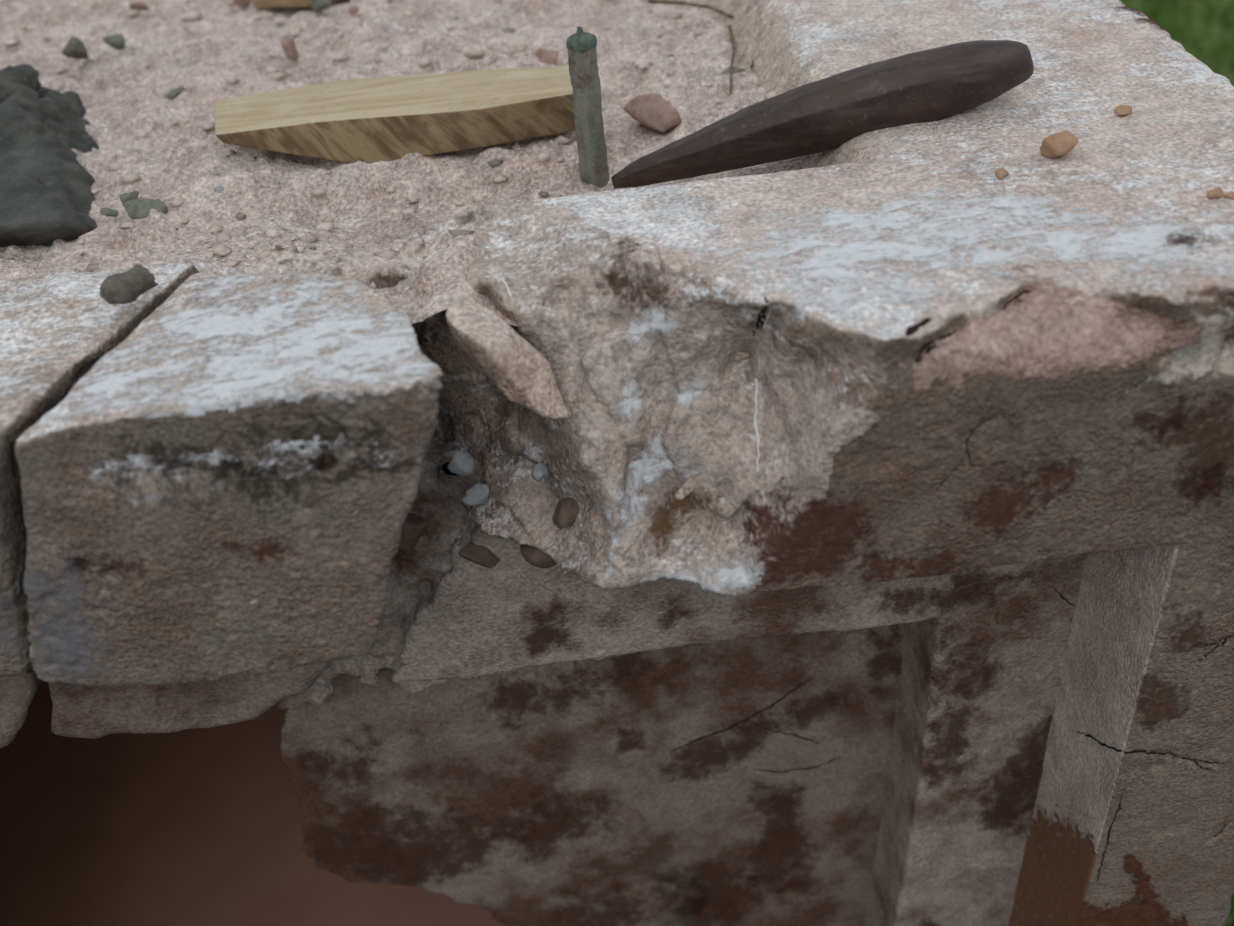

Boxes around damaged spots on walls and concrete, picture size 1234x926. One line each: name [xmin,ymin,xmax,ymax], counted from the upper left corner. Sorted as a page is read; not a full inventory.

spalling [446,200,887,596]
corrosion [743,482,954,584]
corrosion [964,452,1079,540]
corrosion [1133,392,1234,504]
damp [527,604,569,656]
damp [662,692,847,780]
crack [670,677,842,773]
damp [868,569,1031,787]
crack [1076,731,1223,771]
corrosion [1136,675,1191,730]
crack [1178,636,1234,660]
damp [301,727,611,886]